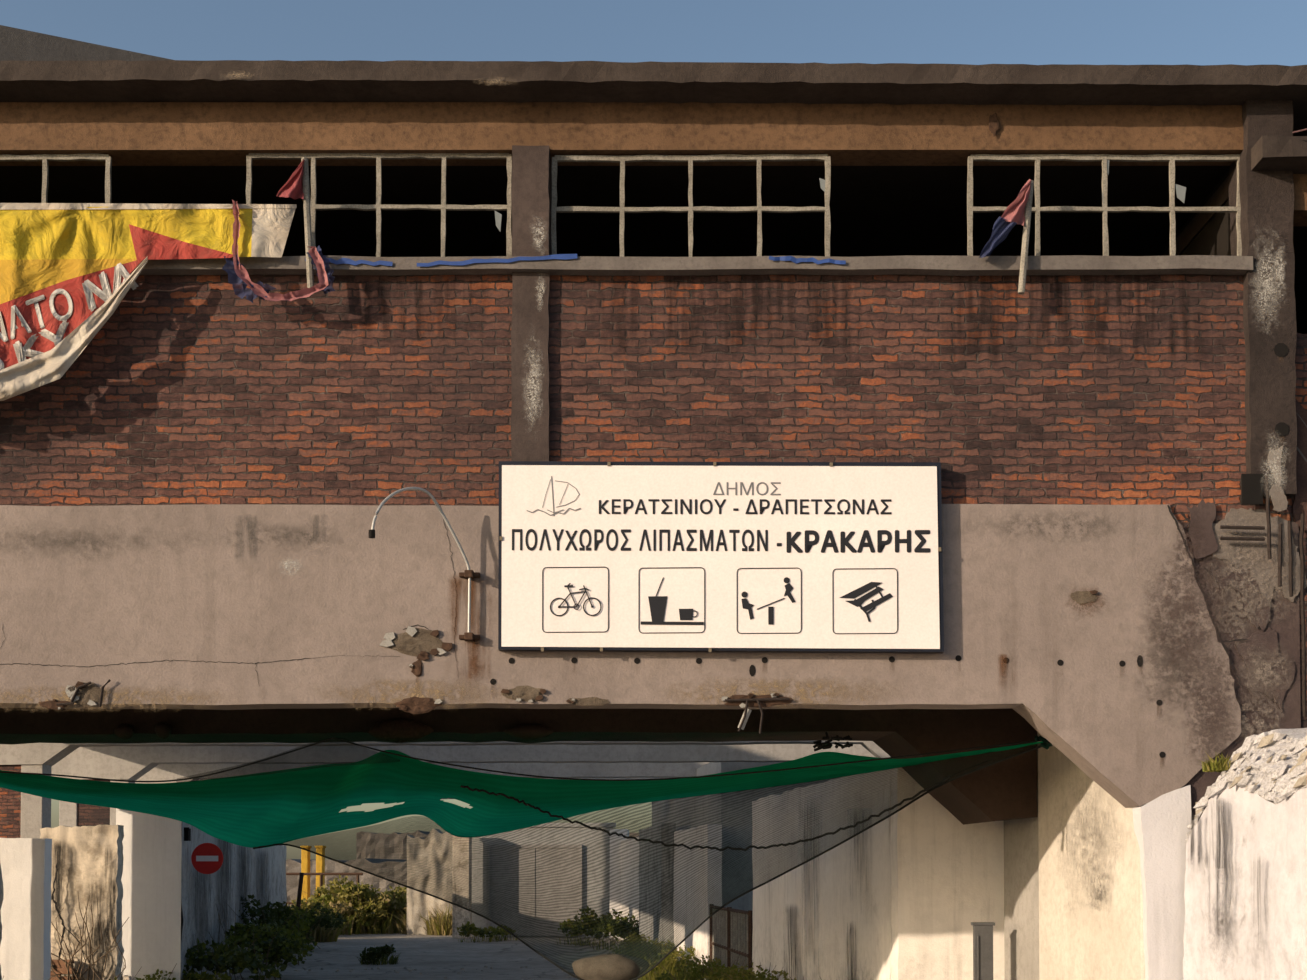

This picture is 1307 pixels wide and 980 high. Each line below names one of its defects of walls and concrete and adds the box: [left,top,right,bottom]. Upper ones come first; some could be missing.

spalling [38,679,111,710]
crack [0,506,460,685]
spalling [379,626,452,661]
corrosion [353,659,479,704]
corrosion [451,580,479,671]
spalling [501,685,547,703]
damp [1156,520,1233,755]
damp [53,843,65,923]
damp [88,850,116,973]